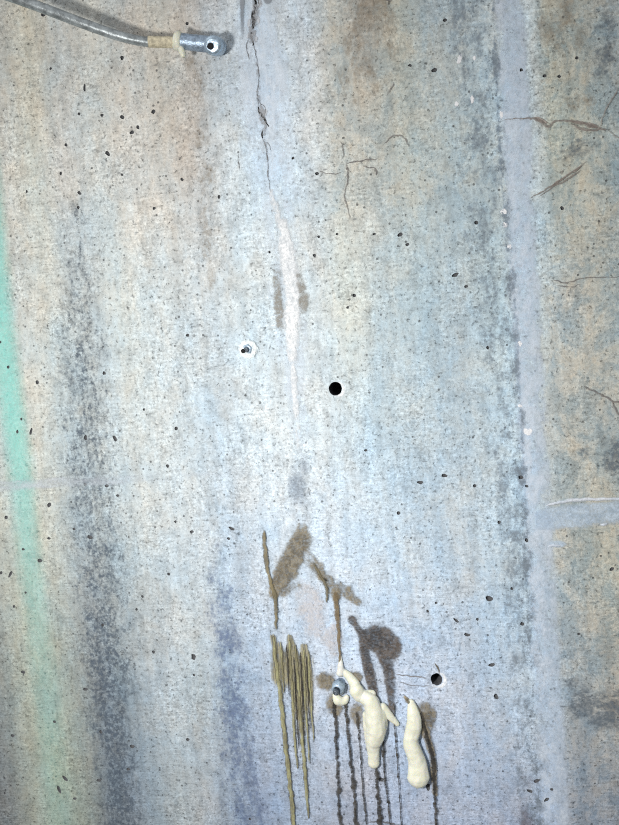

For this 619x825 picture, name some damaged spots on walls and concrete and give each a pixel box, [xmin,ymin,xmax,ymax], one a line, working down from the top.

crack [246,0,271,188]
water stain [262,525,402,825]
water stain [418,702,438,825]